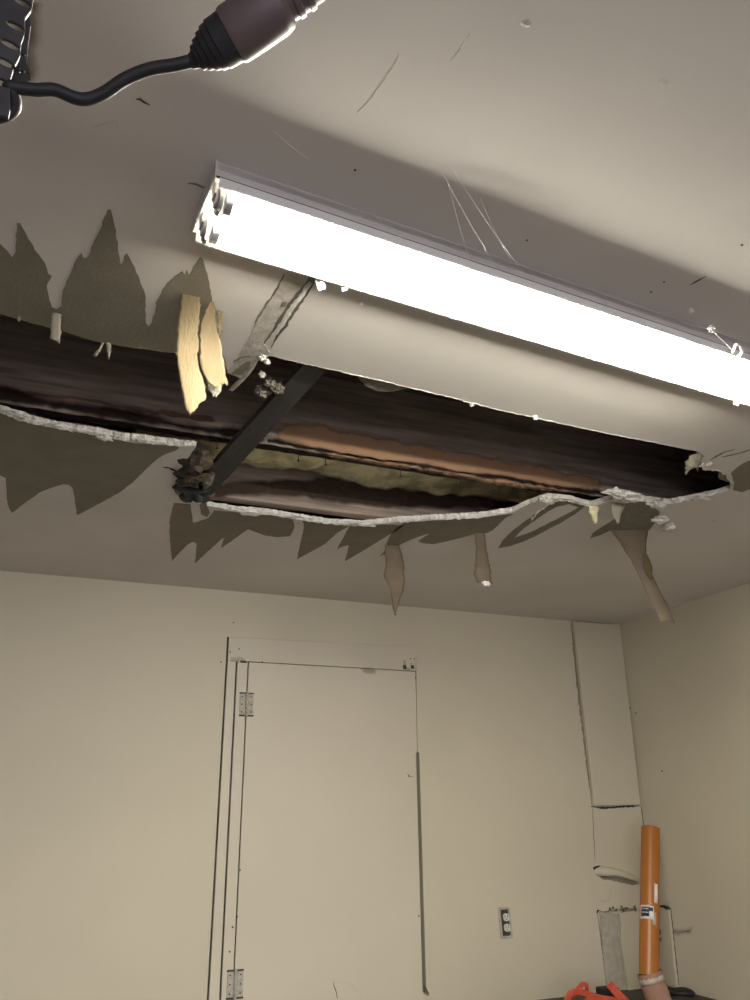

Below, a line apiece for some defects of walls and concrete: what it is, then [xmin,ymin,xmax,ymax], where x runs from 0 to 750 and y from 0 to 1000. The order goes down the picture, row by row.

peeling [272,276,316,340]
spalling [0,405,197,447]
spalling [273,356,700,453]
spalling [207,493,617,527]
spalling [640,466,733,504]
crack [571,623,644,855]
crack [596,905,638,973]
spalling [599,910,641,990]
spalling [660,905,679,987]